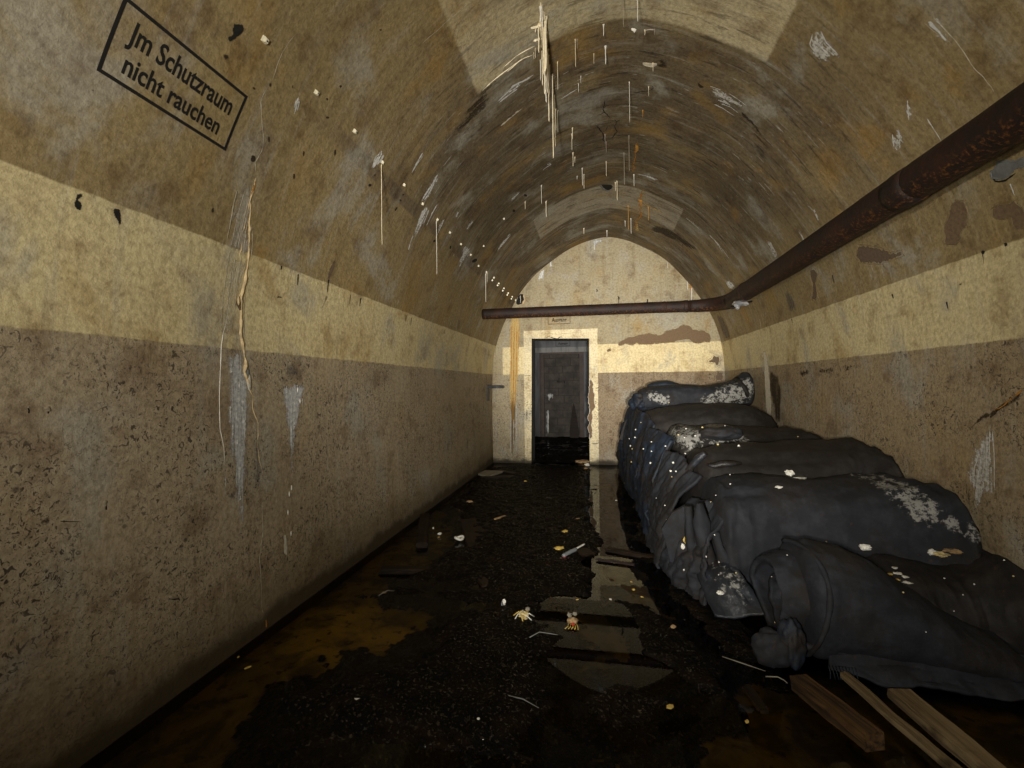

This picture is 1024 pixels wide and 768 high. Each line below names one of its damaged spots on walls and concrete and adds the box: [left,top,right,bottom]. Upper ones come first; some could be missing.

leakage [229,354,248,515]
leakage [284,384,304,471]
leakage [966,431,995,505]